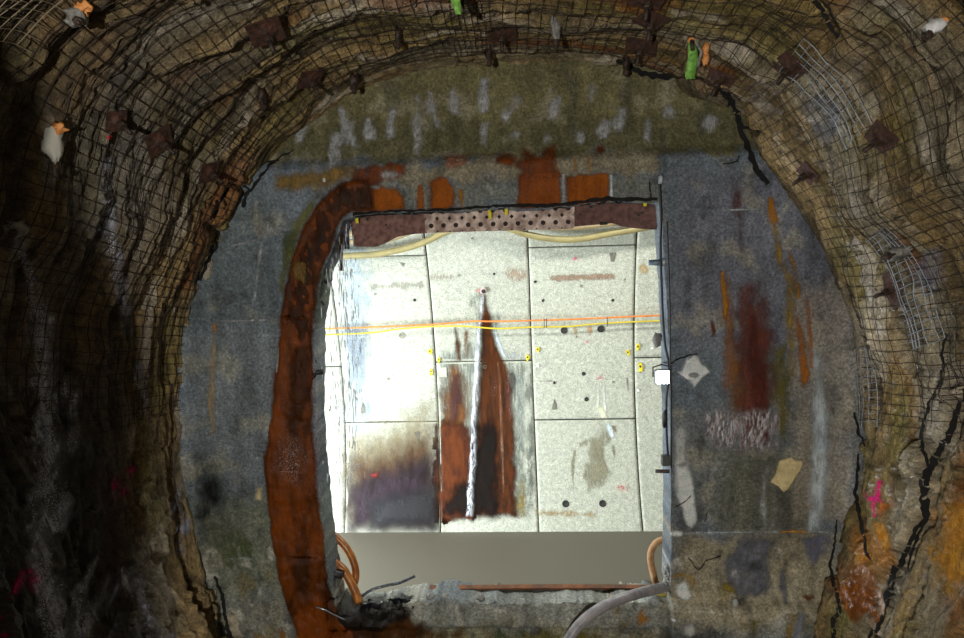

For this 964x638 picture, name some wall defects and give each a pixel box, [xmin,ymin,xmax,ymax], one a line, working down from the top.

efflorescence [315,109,375,168]
efflorescence [412,93,439,154]
corrosion [417,155,467,209]
efflorescence [478,78,489,136]
corrosion [496,146,609,208]
efflorescence [596,109,625,138]
crack [616,59,770,186]
corrosion [263,163,460,638]
damp [341,230,435,529]
corrosion [435,289,533,521]
corrosion [706,198,814,449]
crack [828,335,964,638]